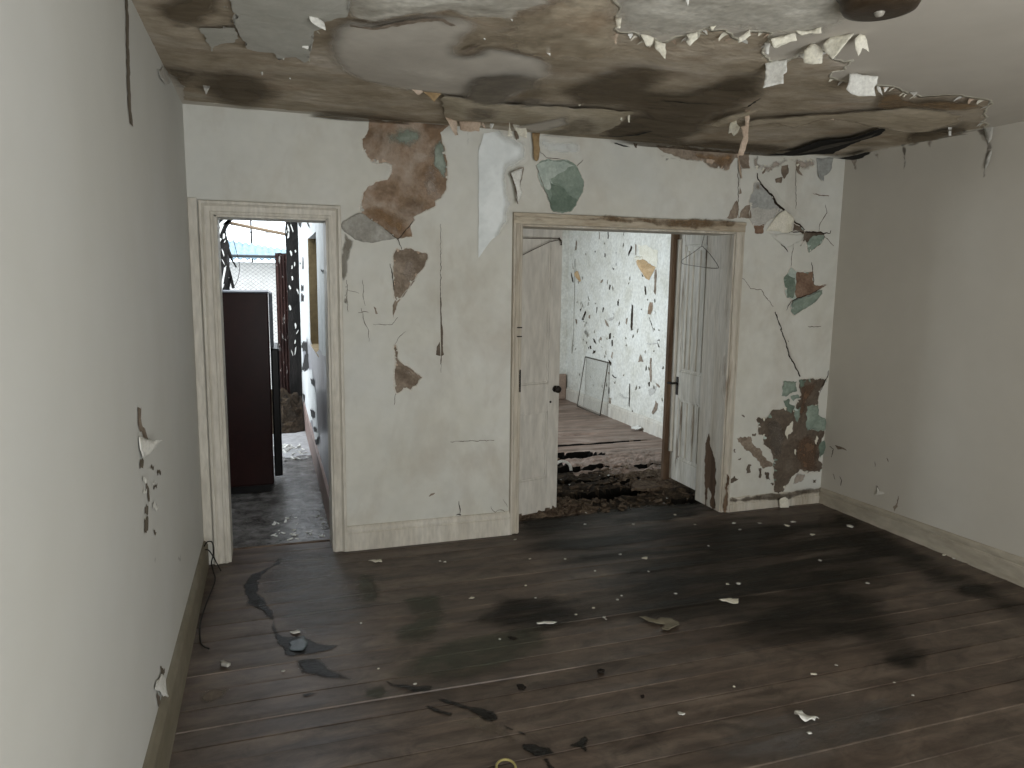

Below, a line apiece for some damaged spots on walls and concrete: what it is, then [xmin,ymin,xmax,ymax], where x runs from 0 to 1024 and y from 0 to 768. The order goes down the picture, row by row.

crack [125,0,133,126]
water stain [173,70,267,106]
water stain [313,114,409,124]
peeling [199,0,546,63]
water stain [508,0,616,59]
water stain [570,69,782,156]
peeling [613,17,869,88]
peeling [358,117,494,317]
crack [727,168,829,265]
crack [436,224,444,373]
crack [742,278,803,377]
flaking render [731,370,829,493]